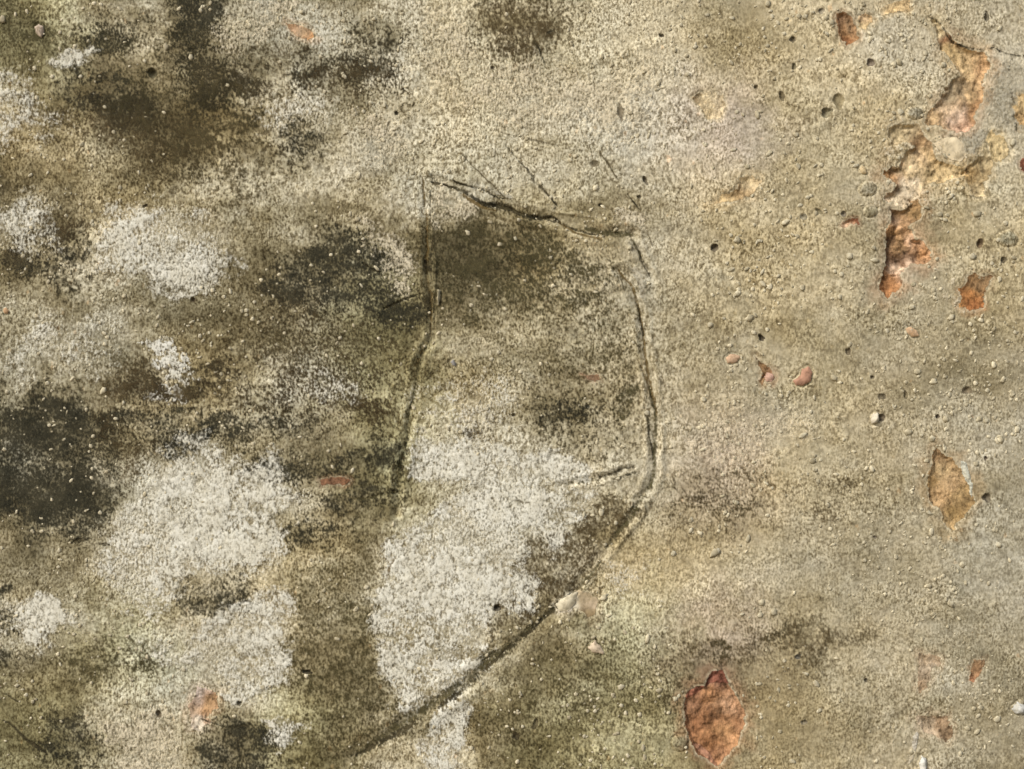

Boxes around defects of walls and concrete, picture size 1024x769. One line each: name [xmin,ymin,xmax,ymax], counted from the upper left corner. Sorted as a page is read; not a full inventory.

water stain [0,190,248,300]
water stain [0,0,309,178]
water stain [268,27,407,168]
water stain [427,179,615,322]
water stain [423,0,652,141]
water stain [616,208,645,225]
spalling [874,18,1009,299]
water stain [0,213,650,769]
crack [347,177,657,759]
spalling [927,448,991,532]
spalling [684,669,746,767]